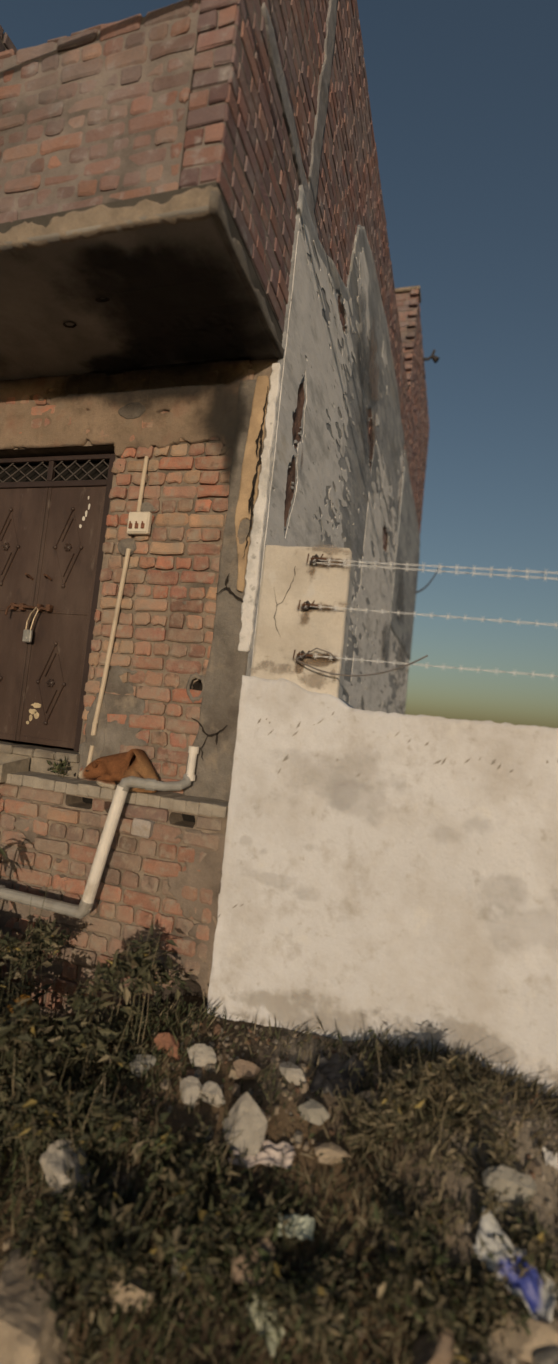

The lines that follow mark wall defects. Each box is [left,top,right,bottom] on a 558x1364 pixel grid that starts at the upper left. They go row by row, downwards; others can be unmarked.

leakage [53,357,134,398]
peeling [235,218,409,736]